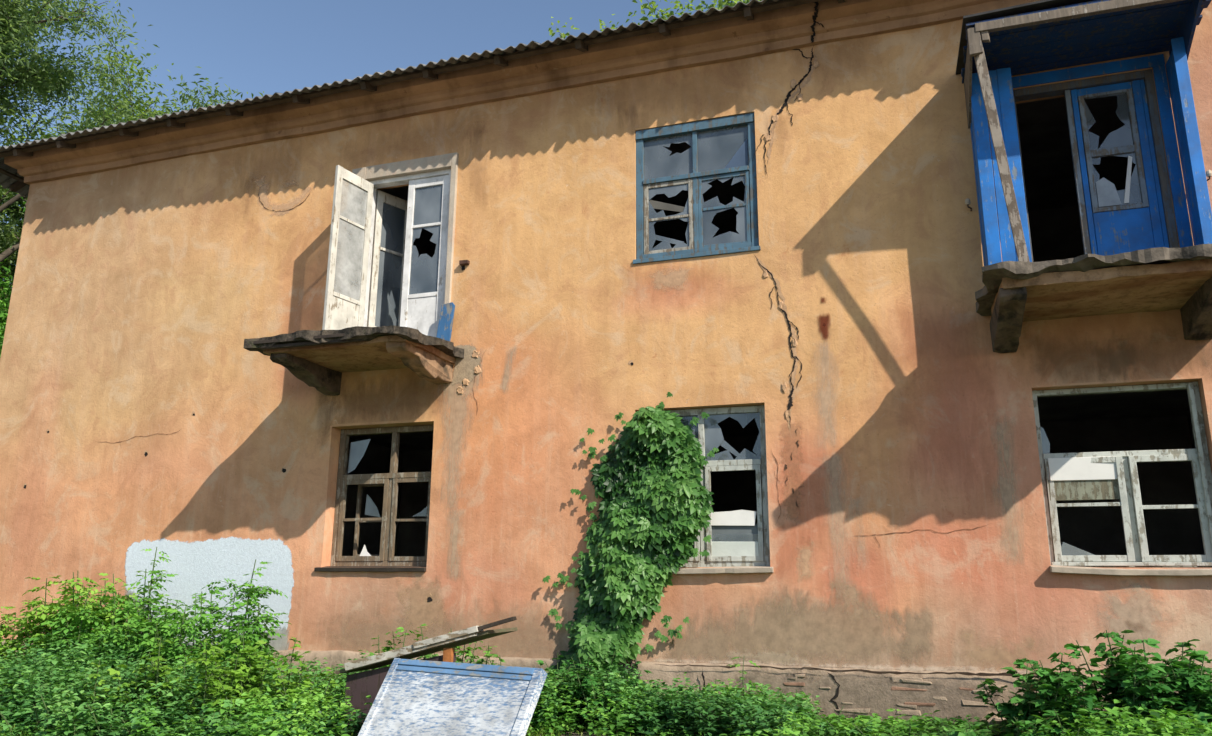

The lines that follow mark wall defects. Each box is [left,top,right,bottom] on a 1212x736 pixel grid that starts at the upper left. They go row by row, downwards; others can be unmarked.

crack [753,2,825,174]
rust [819,298,830,339]
crack [755,254,802,521]
crack [864,525,986,546]
peeling [781,674,870,714]
peeling [891,676,947,716]
peeling [959,684,1007,721]